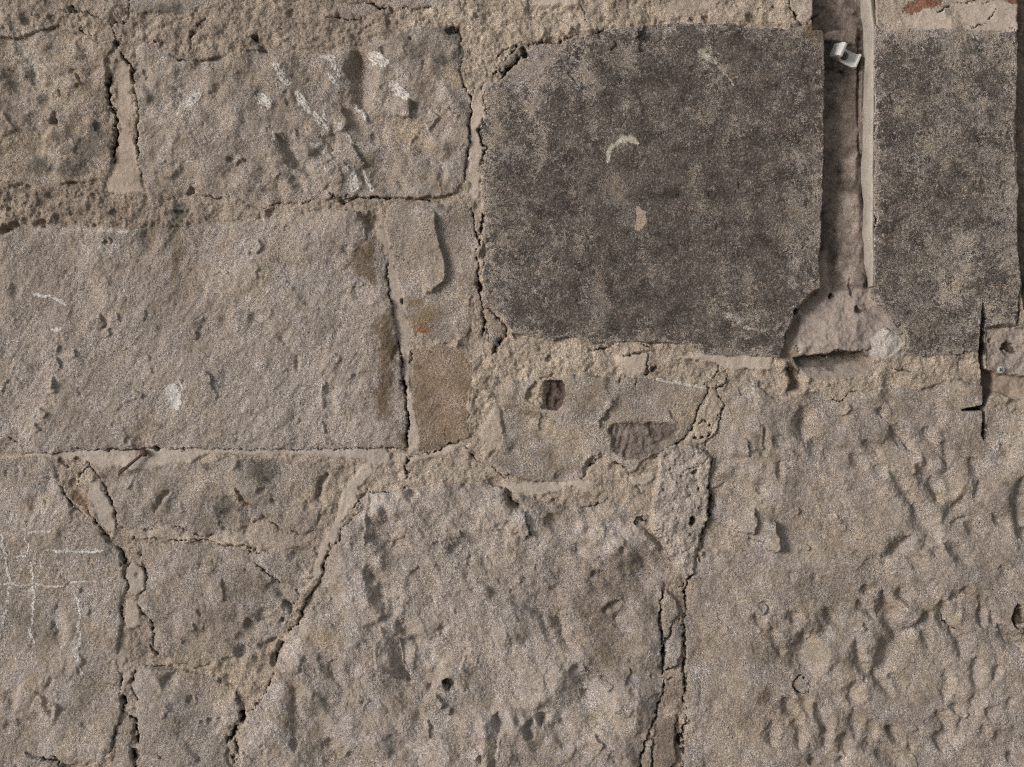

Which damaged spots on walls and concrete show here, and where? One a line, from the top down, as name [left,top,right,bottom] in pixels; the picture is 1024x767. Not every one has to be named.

crack [9,341,531,767]
crack [639,362,727,767]